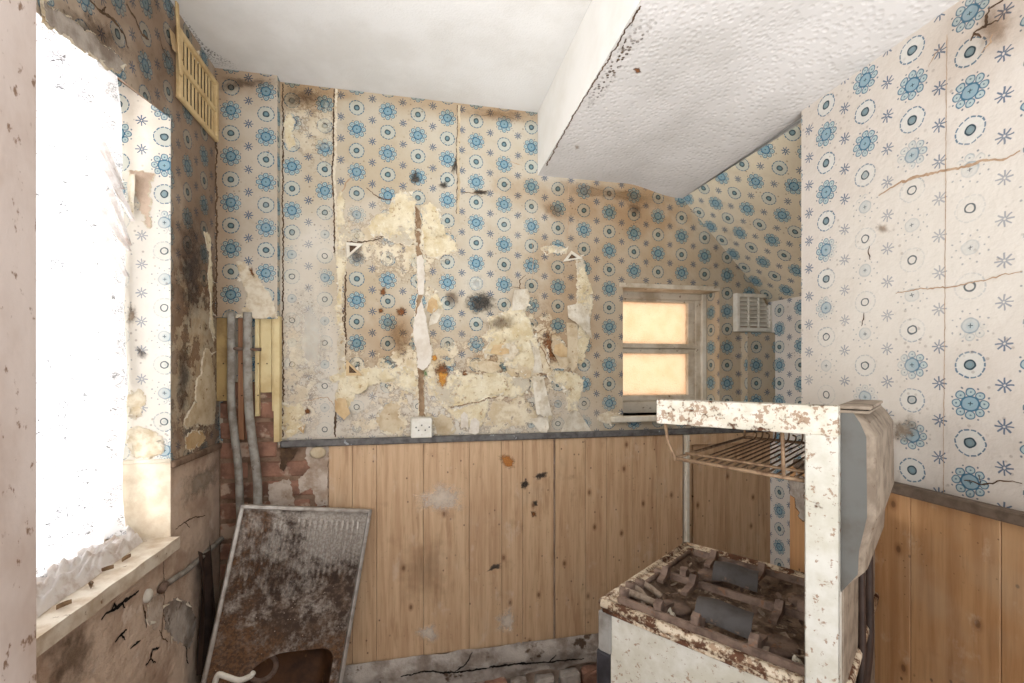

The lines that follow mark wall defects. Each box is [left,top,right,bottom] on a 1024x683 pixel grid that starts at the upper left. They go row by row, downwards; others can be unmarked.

water stain [83,19,112,45]
crack [970,0,1003,53]
mould [184,231,200,306]
water stain [467,293,504,325]
water stain [178,356,189,407]
flaking render [183,336,329,597]
crack [101,561,189,665]
spalling [146,593,196,649]
crack [401,653,584,677]